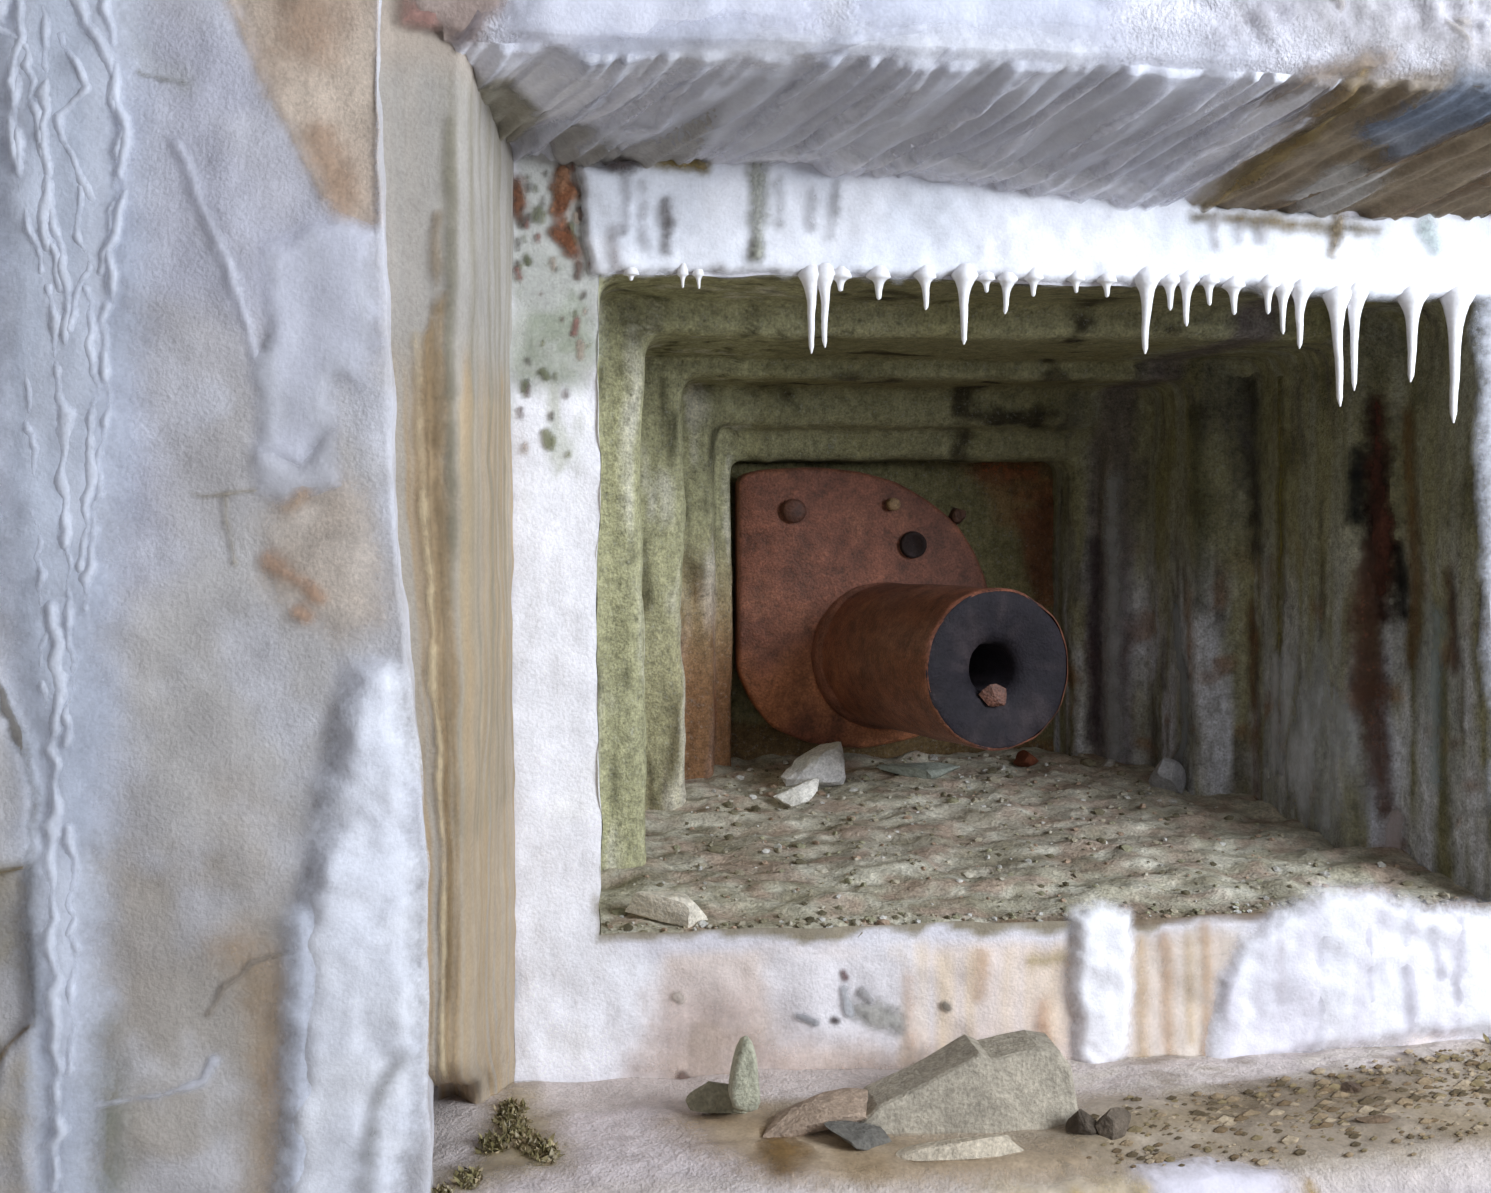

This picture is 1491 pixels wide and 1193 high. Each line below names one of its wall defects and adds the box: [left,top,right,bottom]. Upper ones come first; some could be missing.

corrosion [513,178,527,216]
corrosion [550,165,581,259]
leakage [513,20,1491,423]
leakage [415,303,468,1101]
leakage [523,413,570,456]
corrosion [973,462,1053,493]
leakage [1089,477,1120,760]
leakage [1237,375,1346,827]
crack [0,684,41,1060]